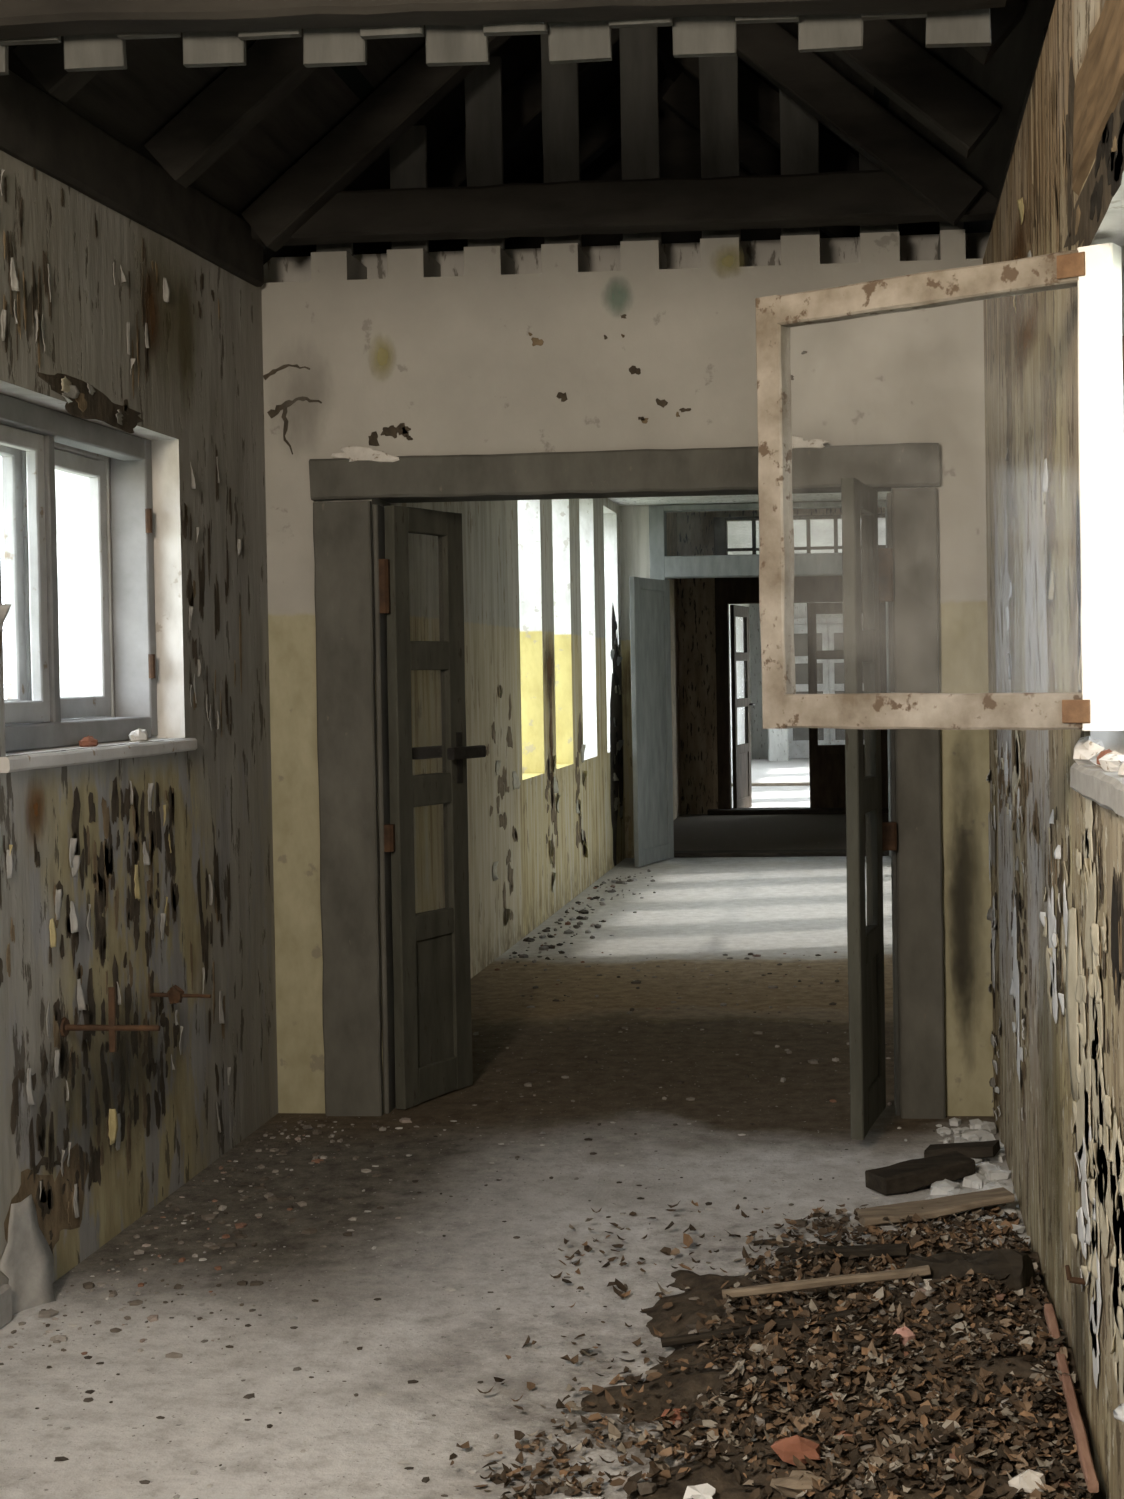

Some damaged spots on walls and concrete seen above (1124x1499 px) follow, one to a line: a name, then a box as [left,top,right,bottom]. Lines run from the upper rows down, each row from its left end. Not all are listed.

spalling [0,170,170,434]
crack [263,364,322,454]
peeling [0,604,11,653]
peeling [183,445,242,738]
peeling [0,776,183,1316]
peeling [190,846,231,1044]
peeling [986,730,1124,1425]